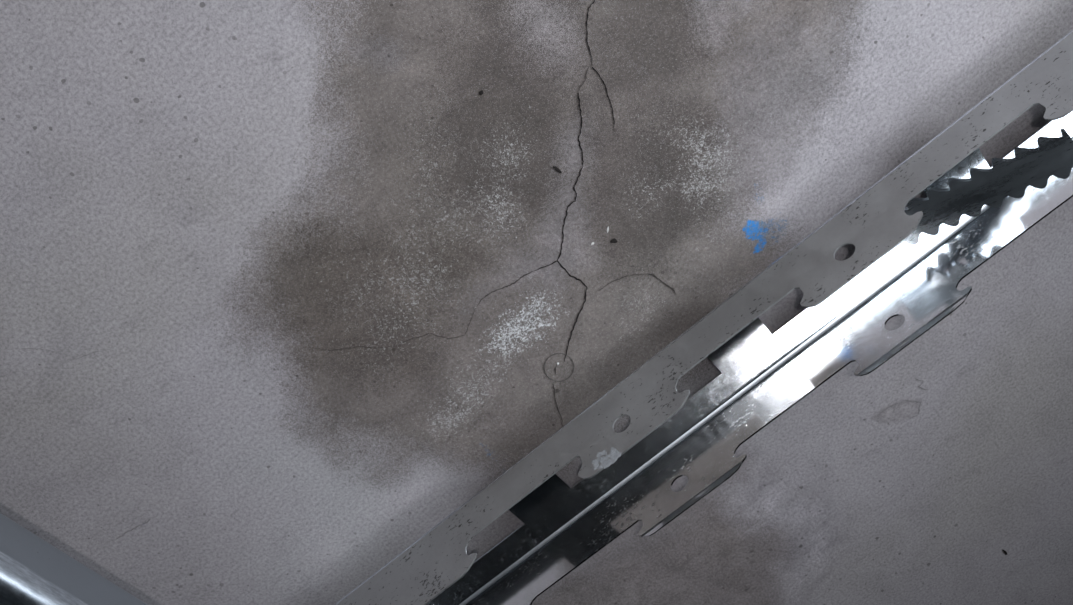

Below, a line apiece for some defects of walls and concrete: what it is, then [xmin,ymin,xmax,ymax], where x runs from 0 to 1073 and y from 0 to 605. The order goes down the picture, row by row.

crack [309,0,677,427]
water stain [197,0,884,501]